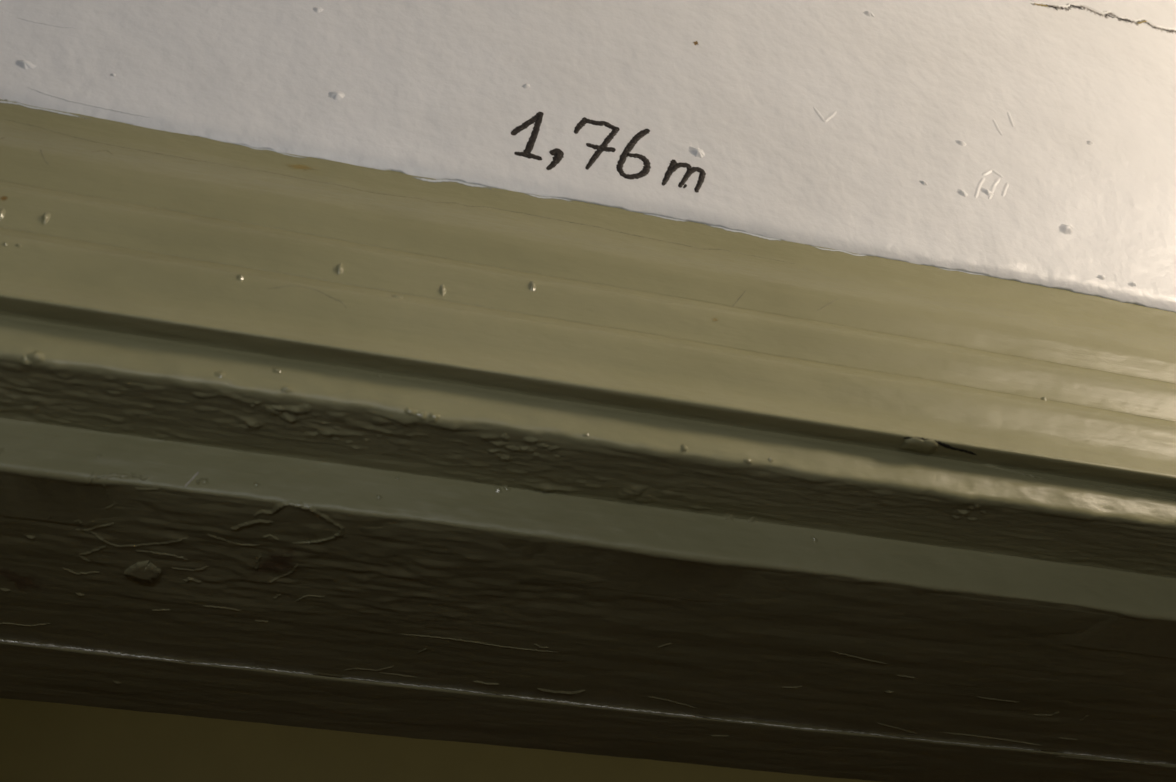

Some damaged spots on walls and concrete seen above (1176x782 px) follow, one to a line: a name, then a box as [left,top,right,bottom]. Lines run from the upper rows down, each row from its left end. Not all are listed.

crack [1031,0,1176,34]
peeling [62,520,209,584]
peeling [208,500,345,570]